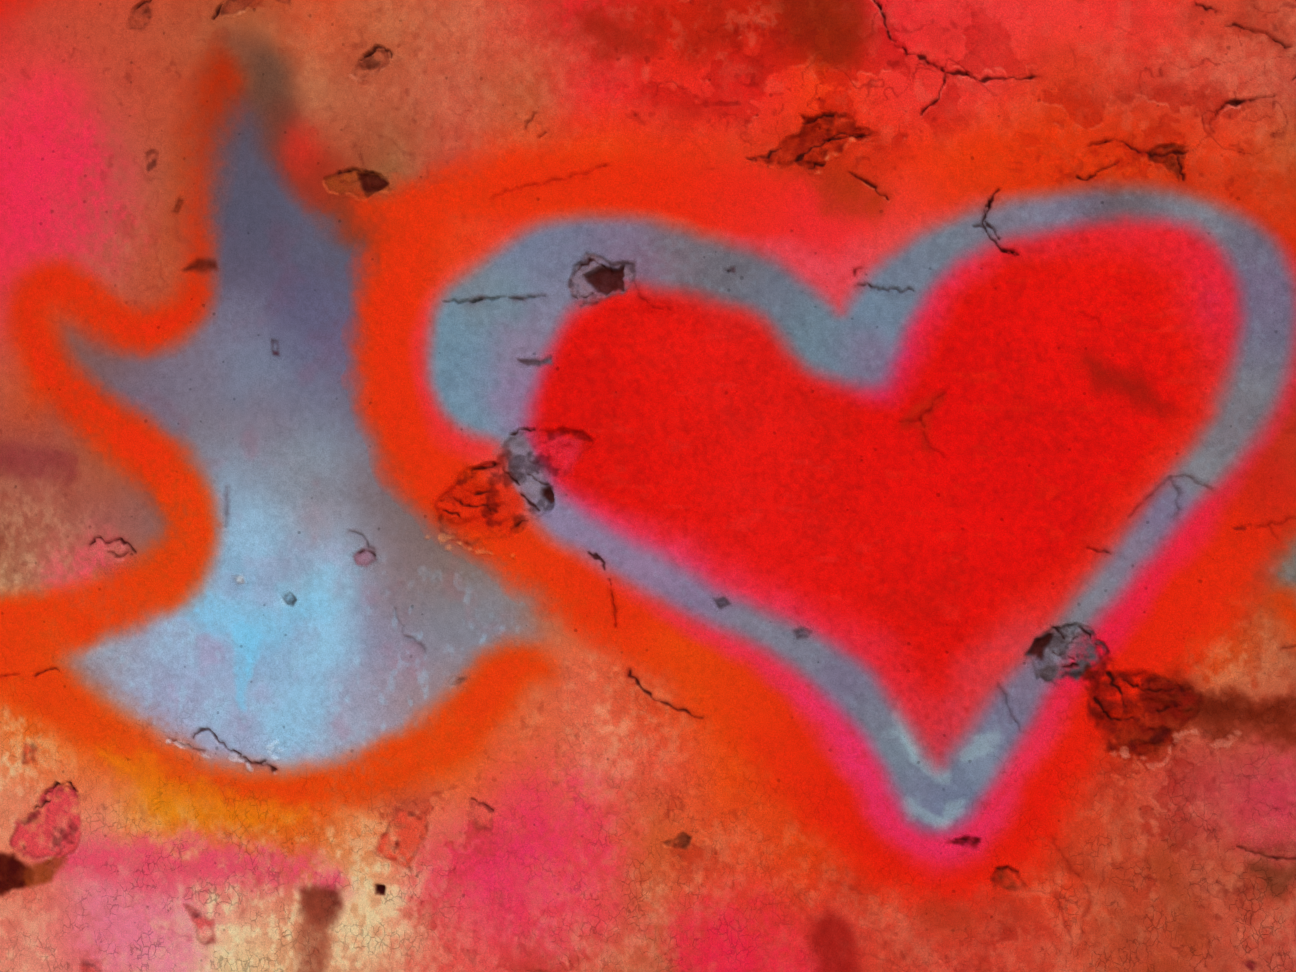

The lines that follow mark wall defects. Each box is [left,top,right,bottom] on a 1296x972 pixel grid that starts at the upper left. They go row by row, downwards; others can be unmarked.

crack [871,0,1048,118]
flaking render [745,105,883,175]
flaking render [320,163,396,203]
crack [972,186,1023,262]
crack [441,291,551,309]
flaking render [563,248,643,312]
flaking render [423,422,600,559]
crack [587,547,621,632]
crack [622,665,708,724]
flaking render [1020,619,1243,771]
crack [164,724,282,778]
flaking render [6,777,86,864]